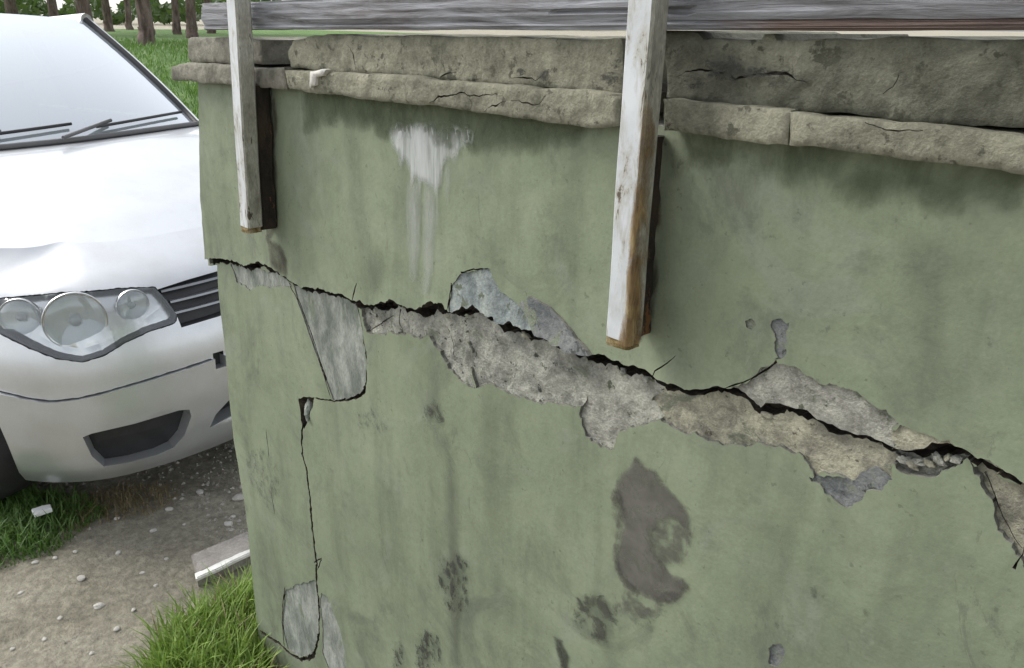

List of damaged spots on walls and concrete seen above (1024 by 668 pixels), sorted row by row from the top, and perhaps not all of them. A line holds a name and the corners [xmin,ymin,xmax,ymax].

crack [441,77,538,106]
damp [392,126,468,189]
crack [370,301,399,331]
crack [425,303,478,345]
crack [711,363,776,388]
crack [304,397,314,422]
flaking render [232,264,1024,556]
crack [760,403,789,420]
crack [896,443,996,496]
damp [612,458,690,617]
peeling [283,580,346,668]